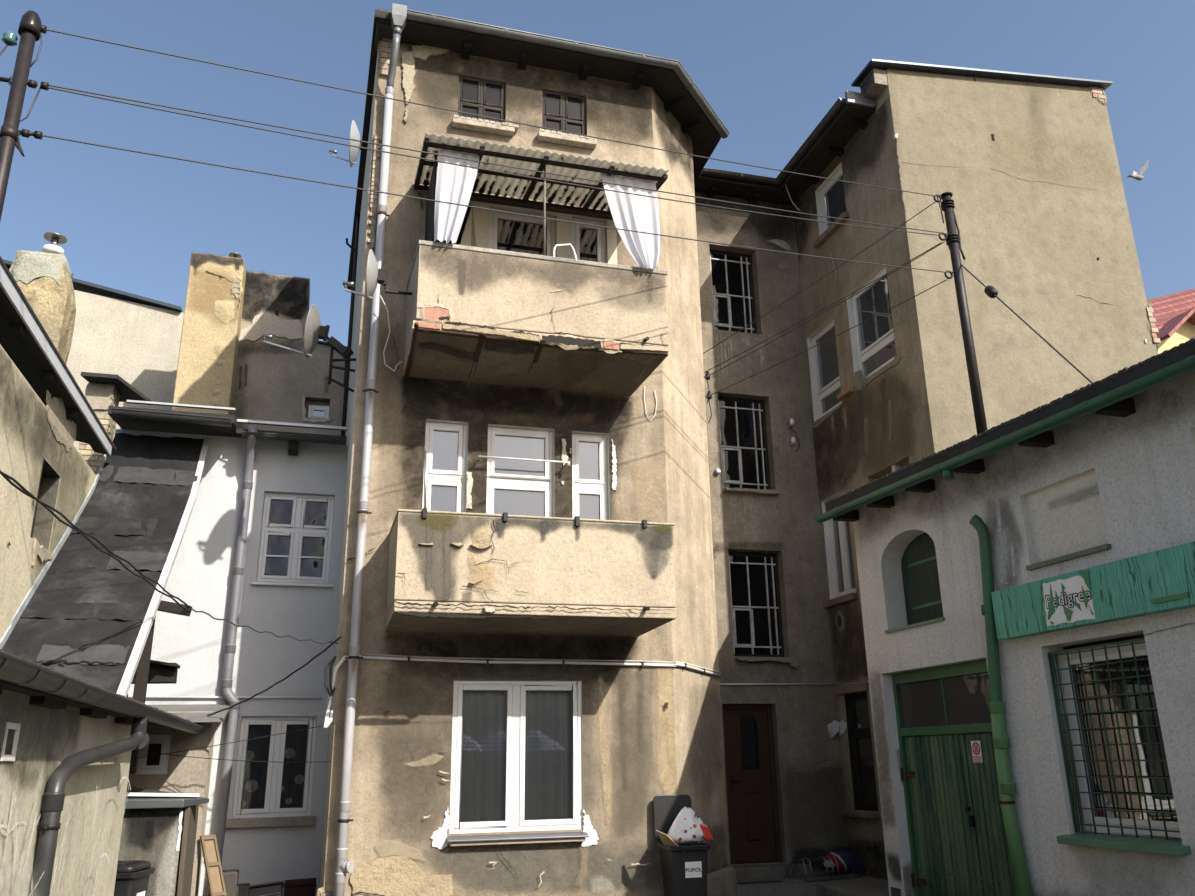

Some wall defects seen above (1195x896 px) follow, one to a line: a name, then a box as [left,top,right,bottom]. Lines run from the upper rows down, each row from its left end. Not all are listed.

flaking render [379,38,449,123]
flaking render [230,276,243,301]
spalling [405,303,669,379]
flaking render [46,389,77,452]
leakage [400,512,582,601]
leakage [603,465,673,577]
leakage [0,700,78,788]
spalling [317,886,334,896]
flaking render [349,855,453,896]